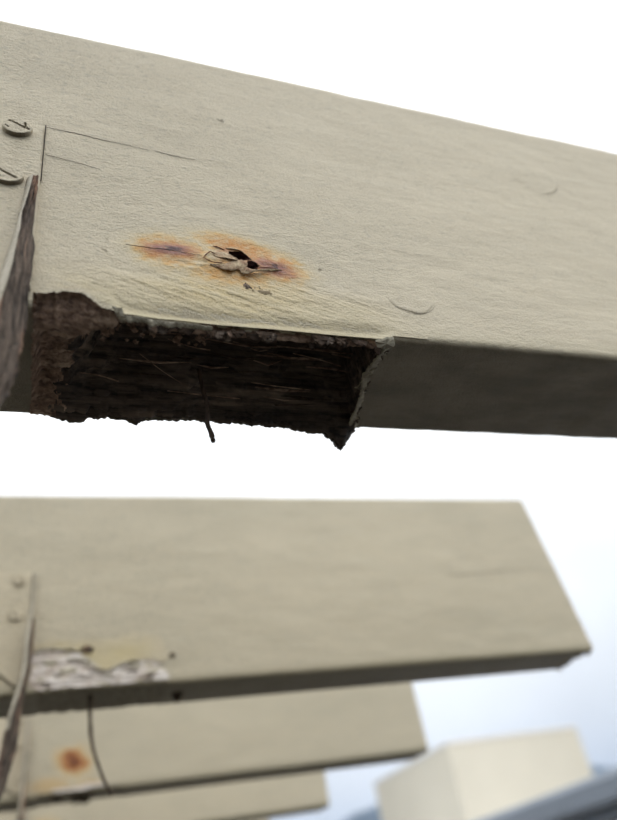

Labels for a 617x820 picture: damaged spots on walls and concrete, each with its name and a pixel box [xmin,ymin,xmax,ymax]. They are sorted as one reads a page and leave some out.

corrosion [102,221,337,305]
peeling [112,306,213,331]
peeling [349,337,395,426]
peeling [30,644,169,691]
corrosion [25,740,103,796]